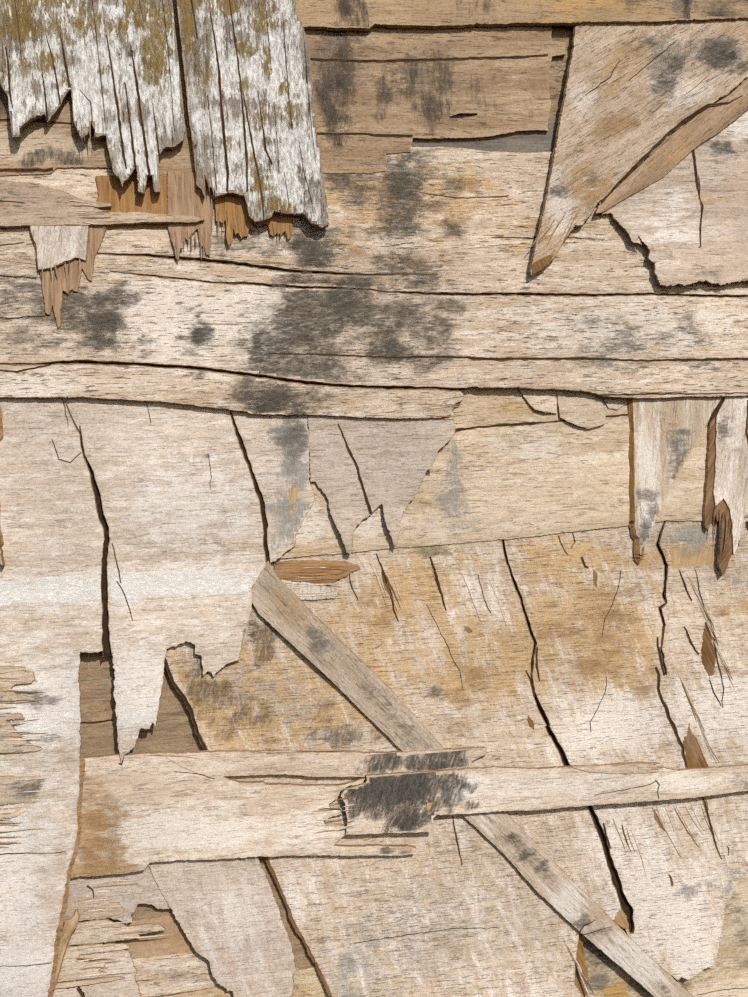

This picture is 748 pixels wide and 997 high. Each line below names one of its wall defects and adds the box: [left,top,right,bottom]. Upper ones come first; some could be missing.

peeling [0,0,328,224]
leakage [326,150,472,236]
leakage [4,279,139,350]
leakage [215,226,466,547]
crack [52,399,133,657]
peeling [0,571,255,608]
crack [229,411,271,565]
crack [501,539,570,766]
crack [655,522,724,767]
leakage [344,750,479,833]
crack [579,780,660,935]
peeling [52,908,80,997]